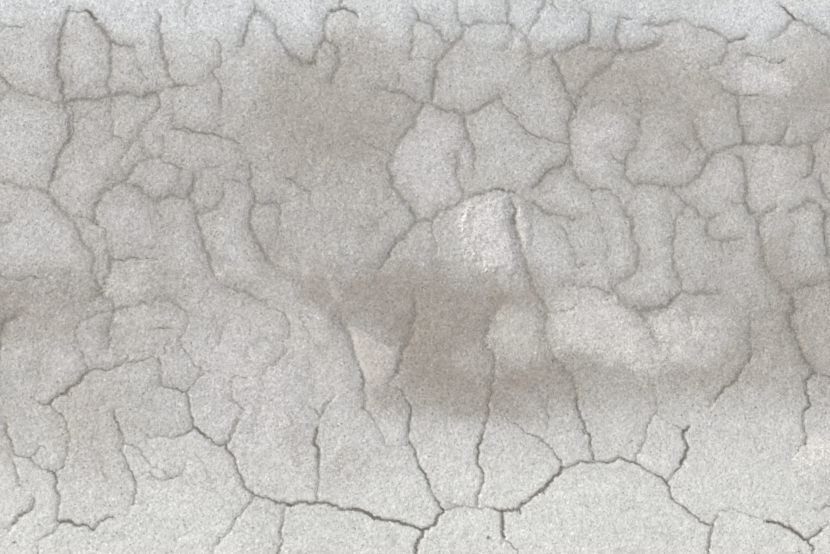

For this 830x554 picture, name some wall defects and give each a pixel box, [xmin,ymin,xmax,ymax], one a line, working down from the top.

leakage [242,34,424,197]
leakage [257,230,830,424]
crack [36,362,123,405]
crack [715,356,751,401]
crack [803,372,815,445]
crack [11,500,35,526]
crack [50,471,113,531]
crack [176,387,444,554]
crack [476,389,713,554]
crack [766,520,823,551]